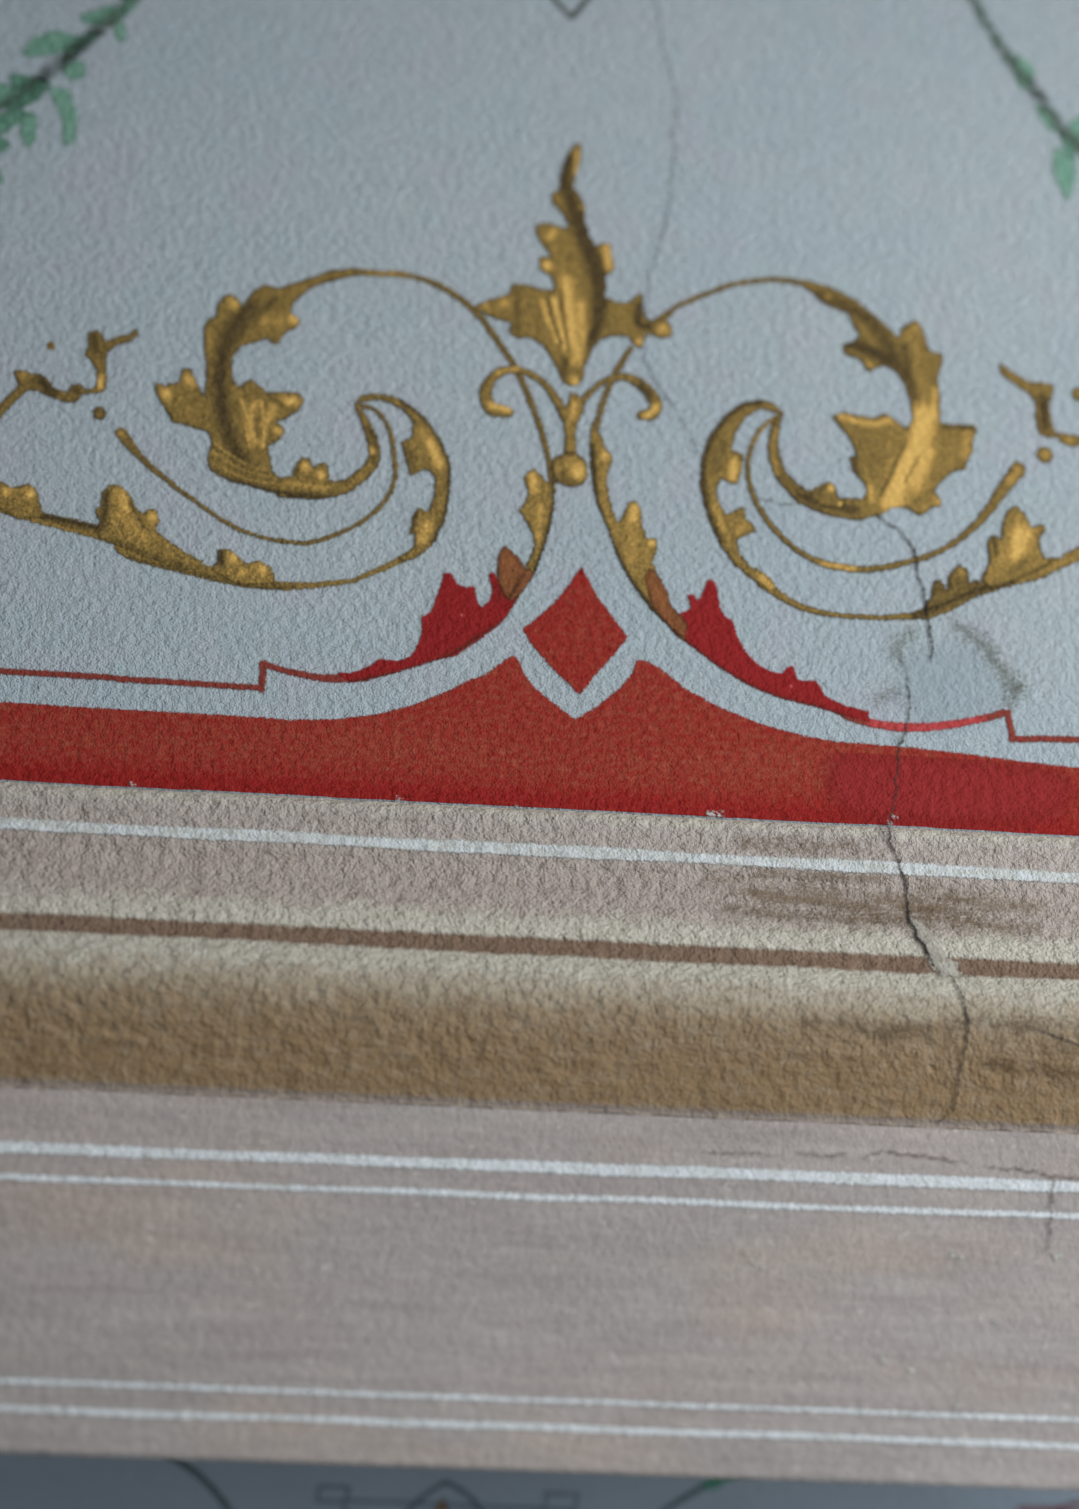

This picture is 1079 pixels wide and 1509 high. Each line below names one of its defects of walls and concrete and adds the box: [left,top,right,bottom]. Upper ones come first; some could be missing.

crack [878,515,970,1121]
crack [1029,1026,1079,1046]
crack [707,1149,1079,1251]